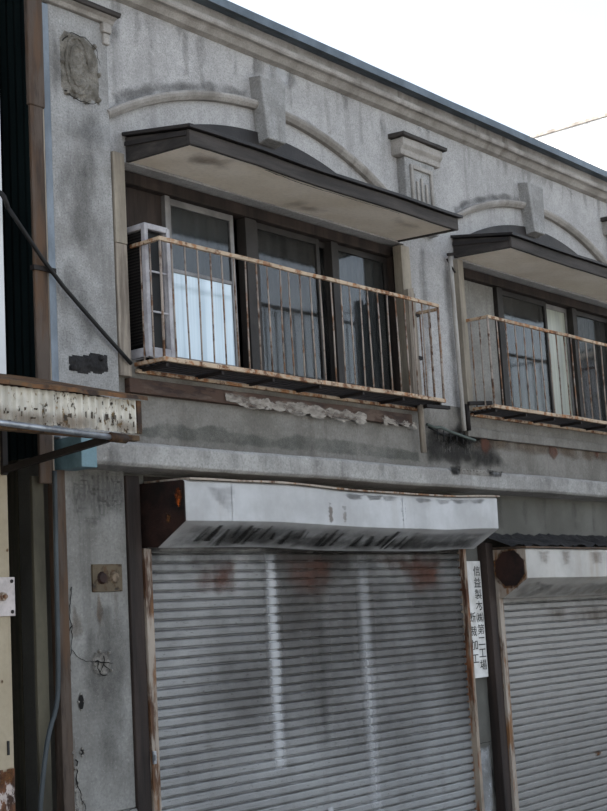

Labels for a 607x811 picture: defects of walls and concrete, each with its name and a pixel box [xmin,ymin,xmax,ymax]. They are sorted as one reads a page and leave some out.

peeling [225,393,367,424]
damp [427,429,500,465]